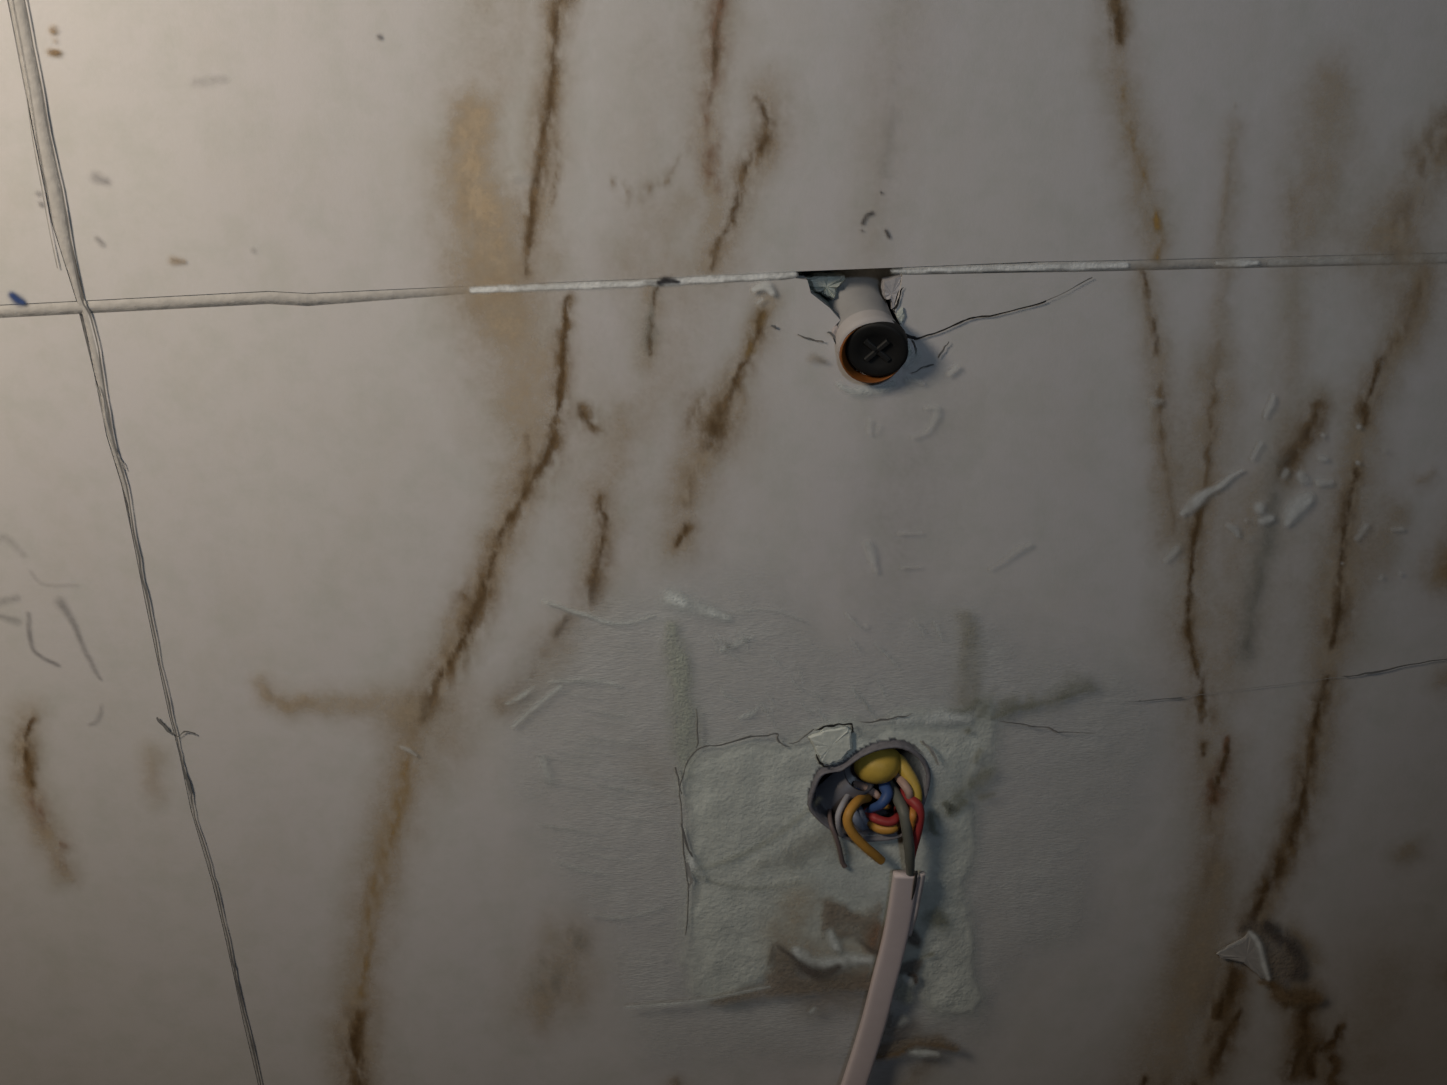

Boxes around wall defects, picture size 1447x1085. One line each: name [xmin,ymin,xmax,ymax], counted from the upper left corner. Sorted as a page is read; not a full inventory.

crack [906,277,1092,373]
rust [667,296,774,554]
rust [335,0,572,1085]
rust [1148,310,1230,954]
rust [1248,266,1432,927]
flaking render [808,723,854,768]
crack [864,713,913,723]
crack [1001,659,1447,733]
crack [675,709,814,935]
spalling [767,901,880,989]
spalling [900,930,933,984]
spalling [1216,920,1324,1005]